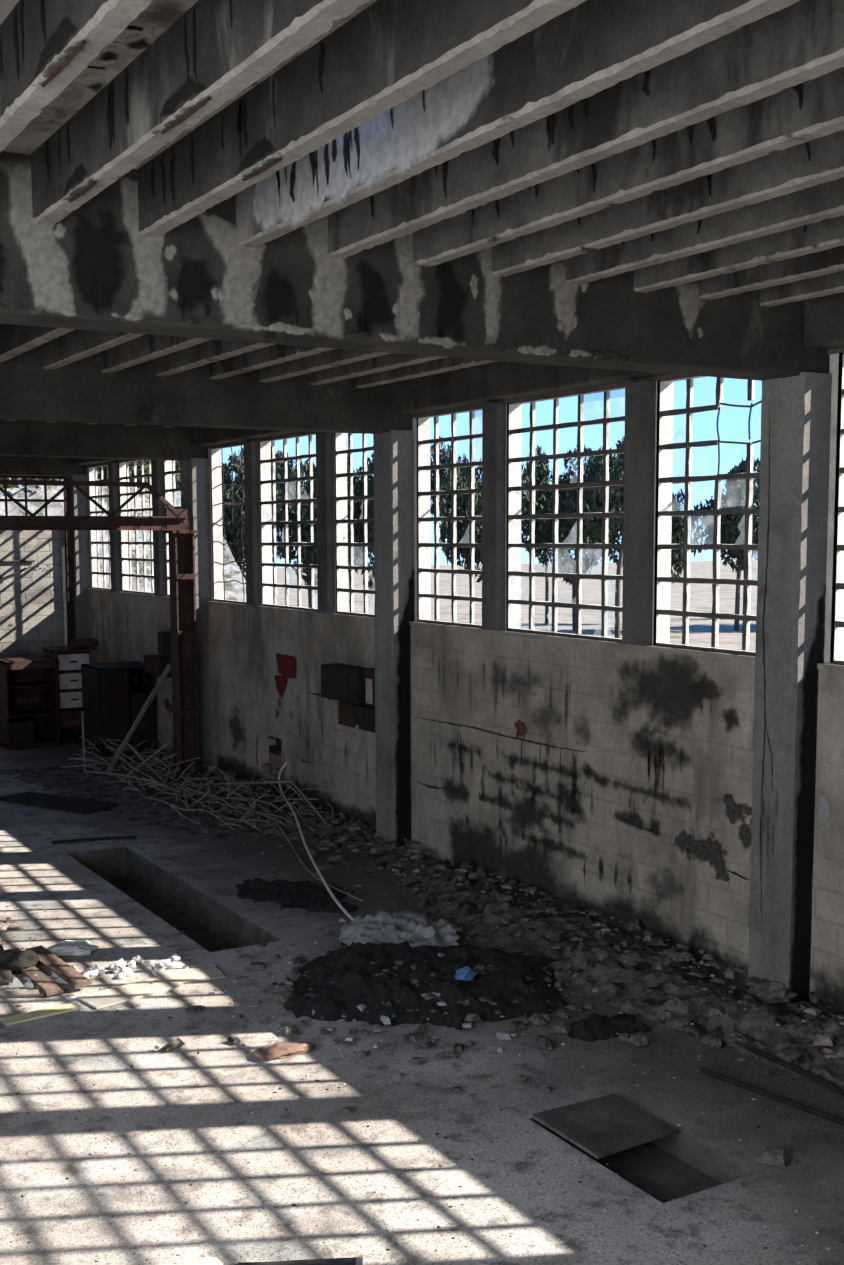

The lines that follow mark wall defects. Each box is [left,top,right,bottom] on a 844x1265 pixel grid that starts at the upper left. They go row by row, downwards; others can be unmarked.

peeling [0,163,77,316]
peeling [111,178,178,320]
water stain [276,127,360,203]
peeling [199,54,492,349]
water stain [395,569,746,982]